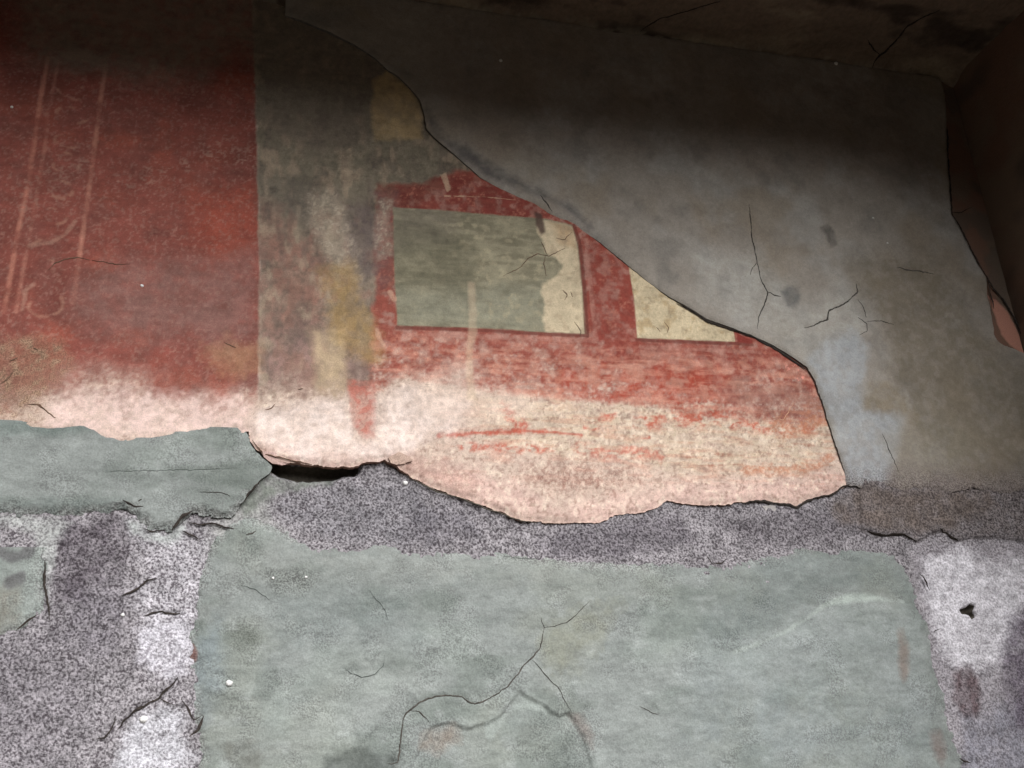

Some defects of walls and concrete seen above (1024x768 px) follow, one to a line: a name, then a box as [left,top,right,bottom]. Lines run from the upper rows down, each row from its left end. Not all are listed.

peeling [440,172,513,200]
crack [504,232,573,299]
crack [804,284,894,335]
crack [123,499,256,540]
flaking render [0,451,1024,768]
crack [95,677,204,740]
crack [388,606,584,764]